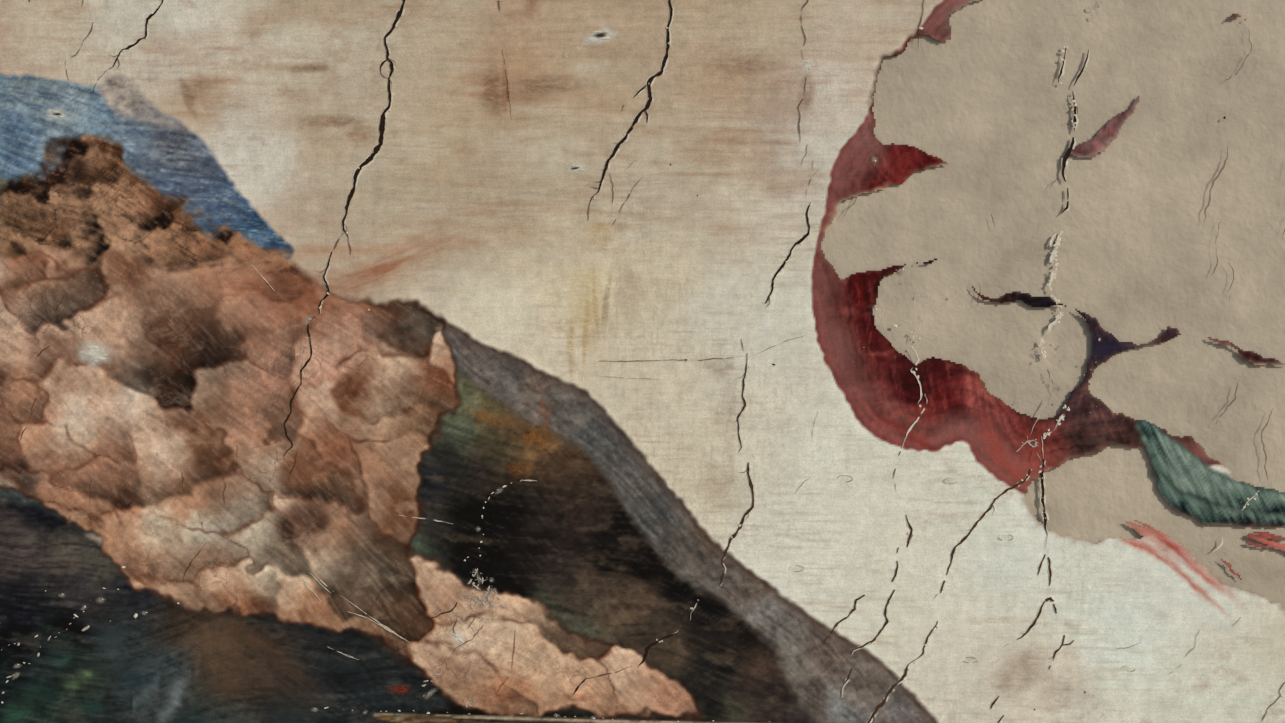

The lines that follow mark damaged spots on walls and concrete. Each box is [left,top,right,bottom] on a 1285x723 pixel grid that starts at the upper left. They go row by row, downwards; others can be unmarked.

crack [66,0,165,91]
crack [284,0,405,477]
crack [587,0,675,224]
flaking render [1031,231,1097,439]
peeling [461,480,522,608]
crack [573,336,803,695]
crack [824,332,928,697]
crack [866,436,1075,723]